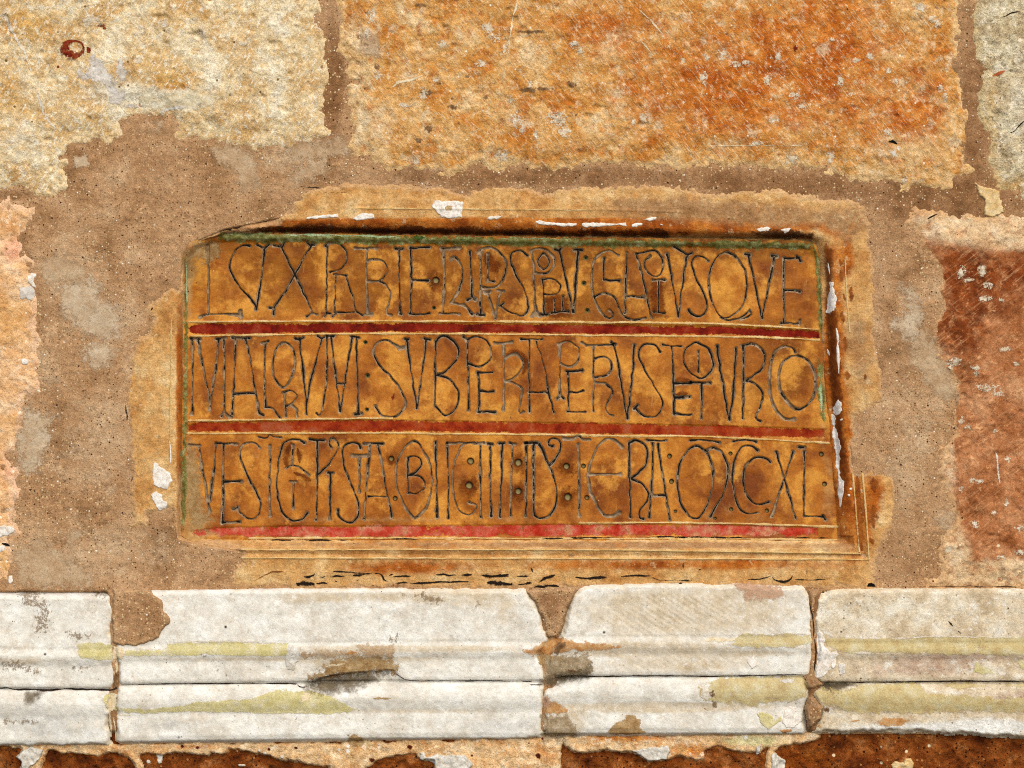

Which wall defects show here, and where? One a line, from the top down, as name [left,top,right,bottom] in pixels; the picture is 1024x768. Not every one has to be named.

spalling [431,200,464,219]
peeling [535,217,663,228]
peeling [827,328,840,373]
peeling [831,400,852,507]
peeling [151,440,173,511]
crack [256,564,701,588]
crack [396,575,826,685]
spalling [523,637,621,679]
spalling [16,746,43,768]
spalling [419,752,473,768]
spalling [632,745,671,762]
spalling [756,744,786,768]